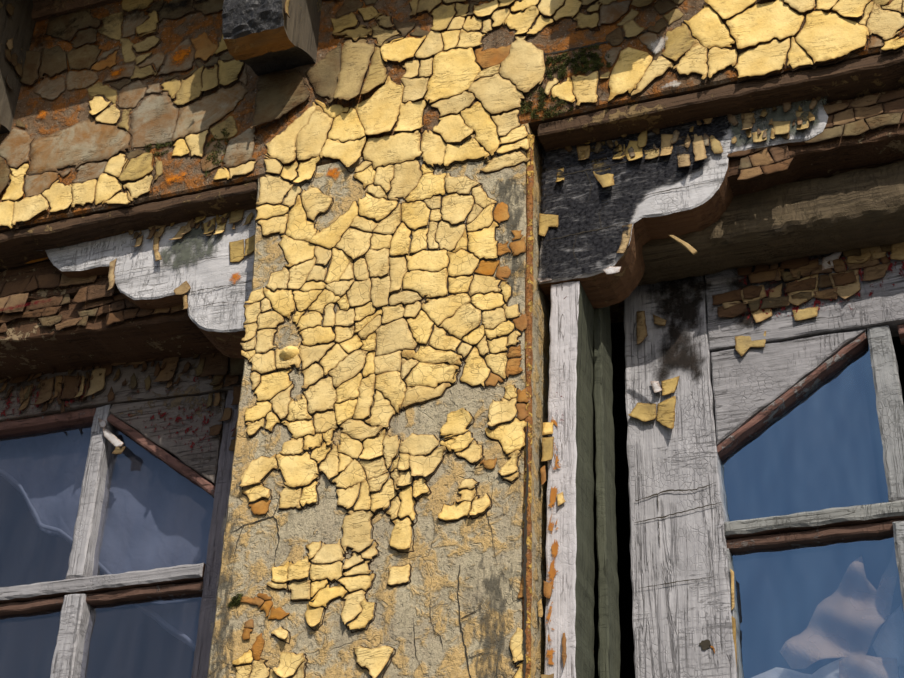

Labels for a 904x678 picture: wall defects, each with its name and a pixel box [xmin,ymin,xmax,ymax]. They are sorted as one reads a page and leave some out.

peeling [0,0,310,232]
peeling [169,209,254,240]
peeling [0,258,191,333]
peeling [193,0,904,633]
water stain [648,276,711,387]
peeling [98,418,126,455]
peeling [240,593,291,645]
peeling [232,619,308,678]
peeling [353,645,396,678]
crack [413,565,498,678]
peeling [509,627,527,678]
peeling [541,633,567,678]